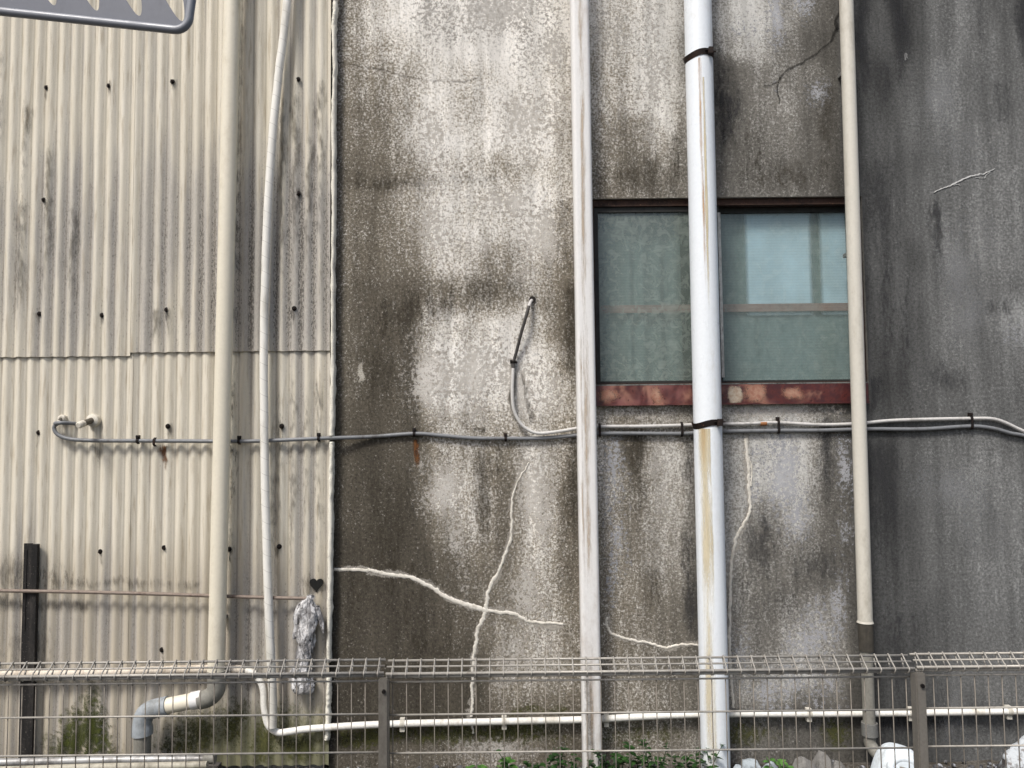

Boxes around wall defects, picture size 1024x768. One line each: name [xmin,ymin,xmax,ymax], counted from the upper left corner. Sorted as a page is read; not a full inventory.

crack [764,13,839,103]
crack [933,169,994,193]
leakage [566,289,575,365]
leakage [569,399,590,554]
leakage [822,426,831,476]
crack [333,459,564,734]
crack [603,615,698,653]
crack [726,434,753,709]